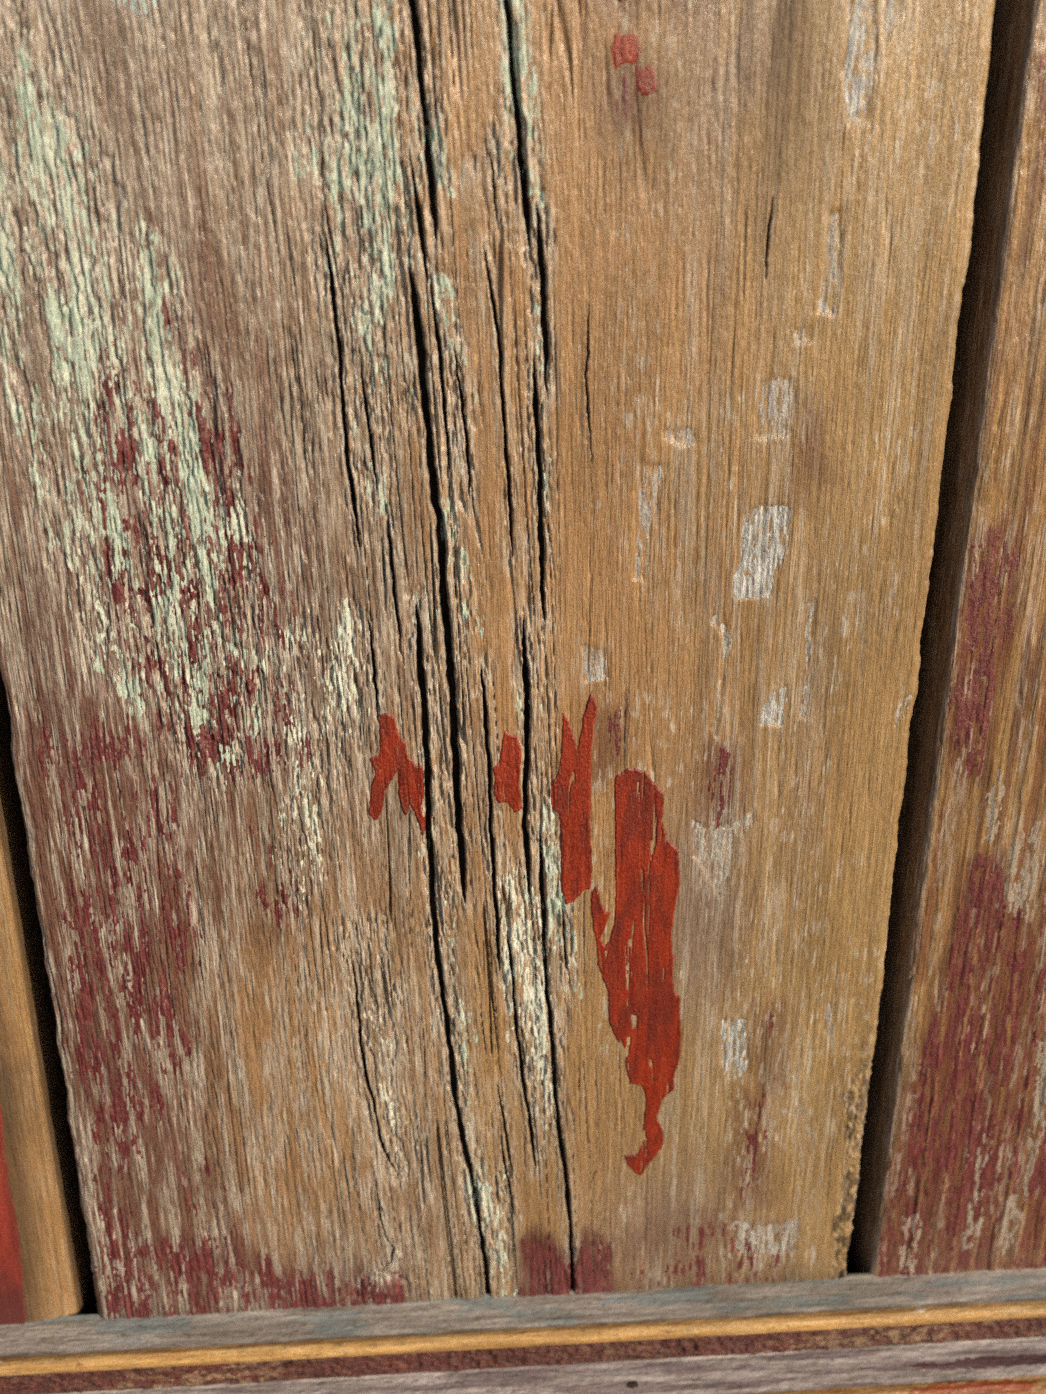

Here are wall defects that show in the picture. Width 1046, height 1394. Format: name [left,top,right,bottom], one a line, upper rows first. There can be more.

peeling [611,33,657,97]
crack [325,0,596,1293]
peeling [368,713,427,835]
peeling [493,731,523,813]
peeling [981,768,1042,923]
peeling [548,646,753,1176]
peeling [899,1212,922,1276]
peeling [962,1131,993,1250]
peeling [1001,1041,1046,1256]